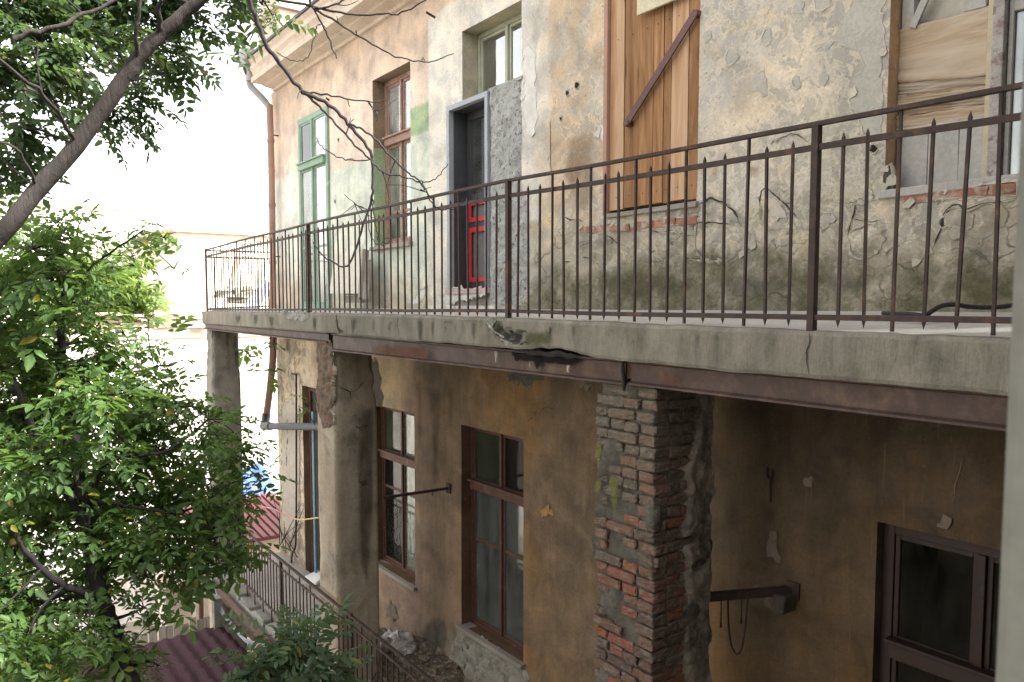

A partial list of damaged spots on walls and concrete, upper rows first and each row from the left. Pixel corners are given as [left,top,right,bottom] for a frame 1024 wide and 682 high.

peeling [826,0,888,135]
crack [758,188,797,220]
crack [845,204,879,235]
crack [934,198,1017,245]
spalling [486,316,529,345]
flaking render [316,340,337,428]
peeling [372,358,384,408]